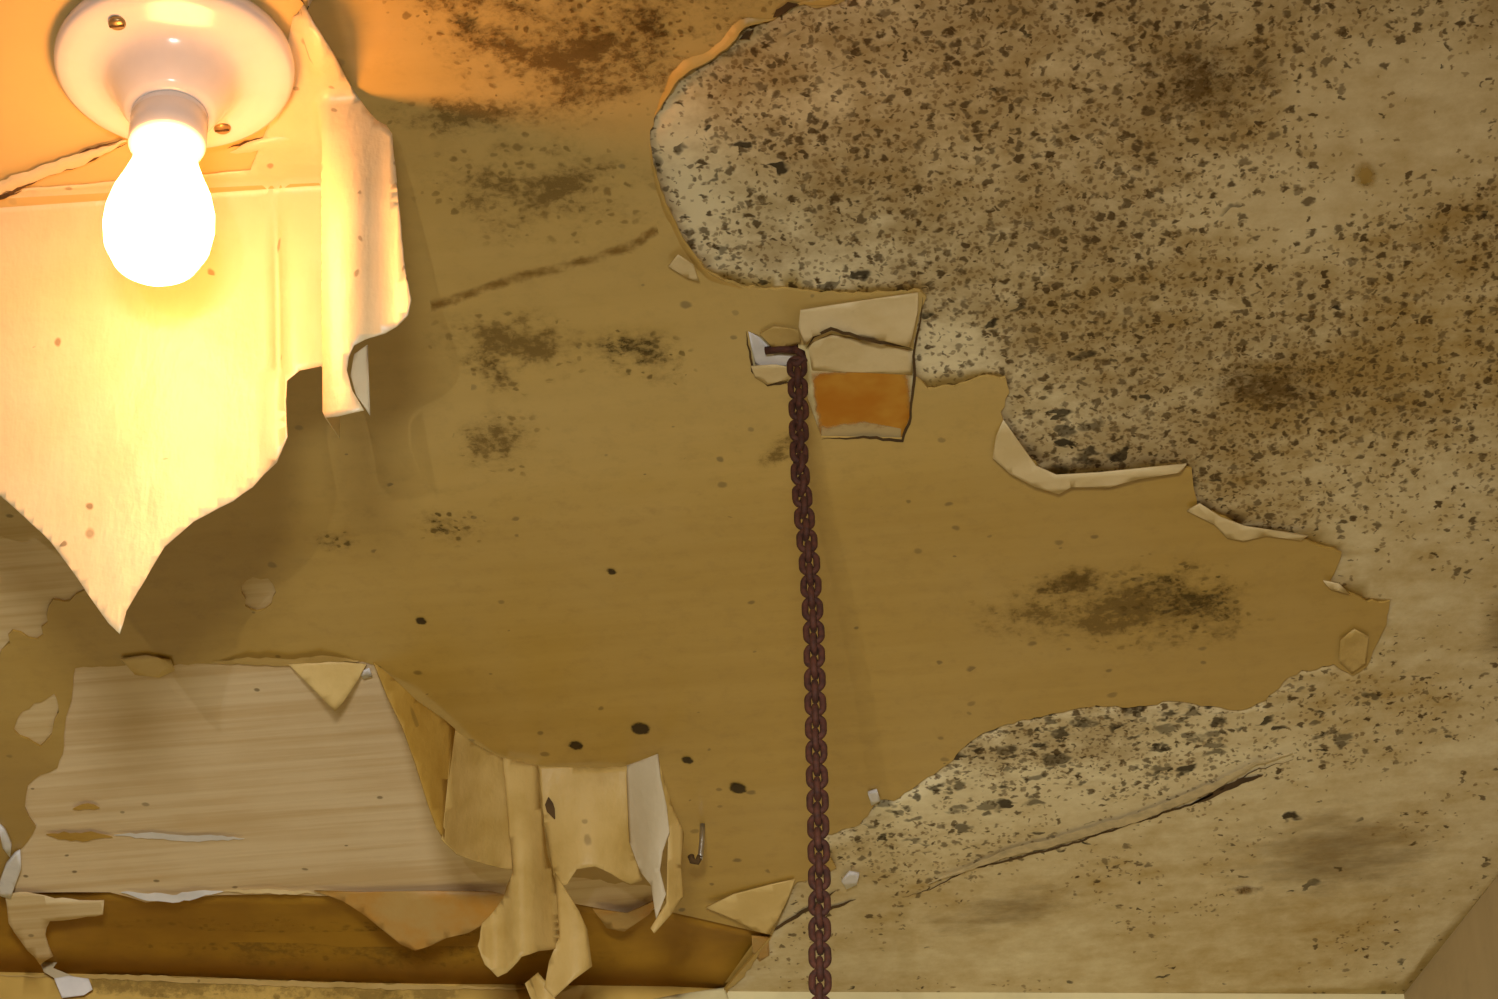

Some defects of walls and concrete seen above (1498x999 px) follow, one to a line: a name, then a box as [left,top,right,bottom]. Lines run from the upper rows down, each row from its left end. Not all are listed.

crack [0,139,127,200]
peeling [0,5,411,651]
mould [431,0,667,107]
flaking render [649,0,1498,994]
damp [1123,576,1228,629]
peeling [0,655,684,999]